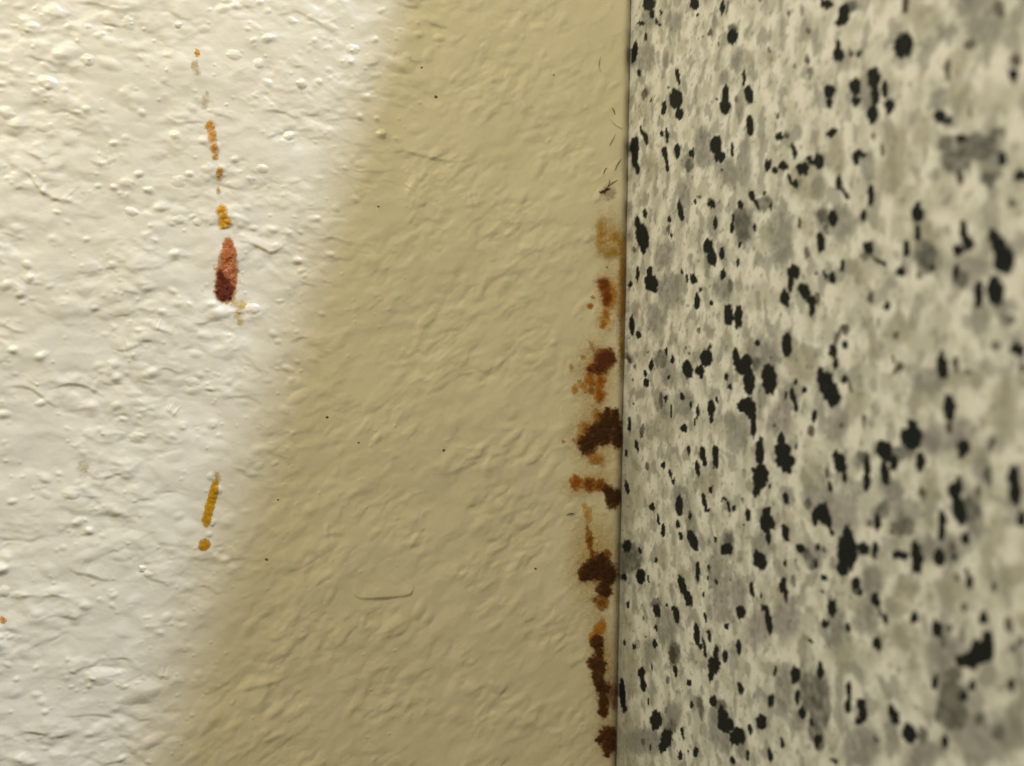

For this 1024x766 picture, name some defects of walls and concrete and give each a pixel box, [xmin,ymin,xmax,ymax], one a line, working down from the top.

corrosion [205,120,246,325]
corrosion [198,472,220,550]
corrosion [562,221,626,758]